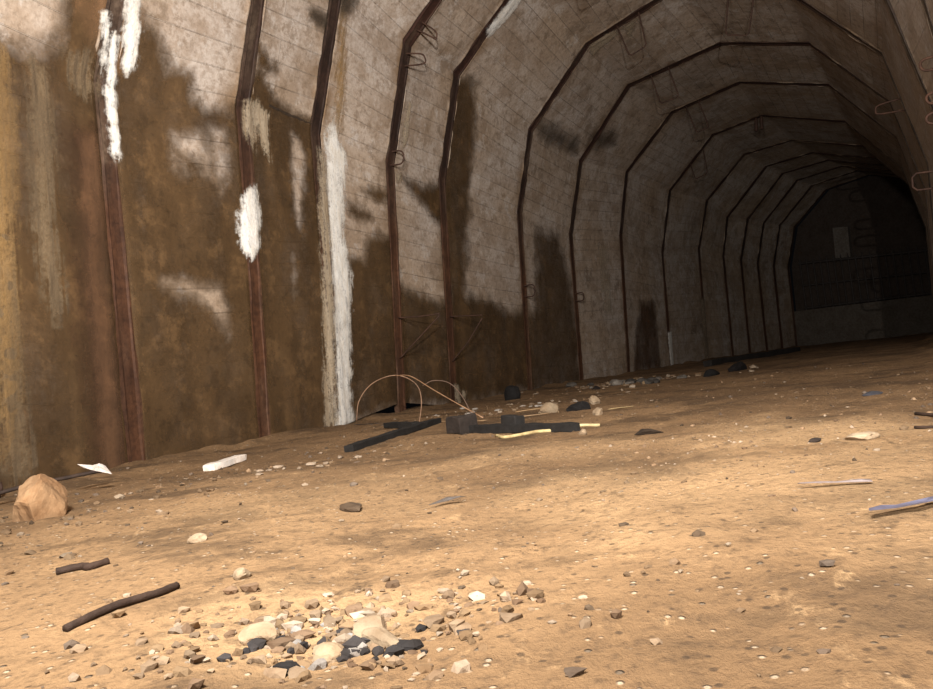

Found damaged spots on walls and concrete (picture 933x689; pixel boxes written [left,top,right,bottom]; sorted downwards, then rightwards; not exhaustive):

damp [0,0,579,490]